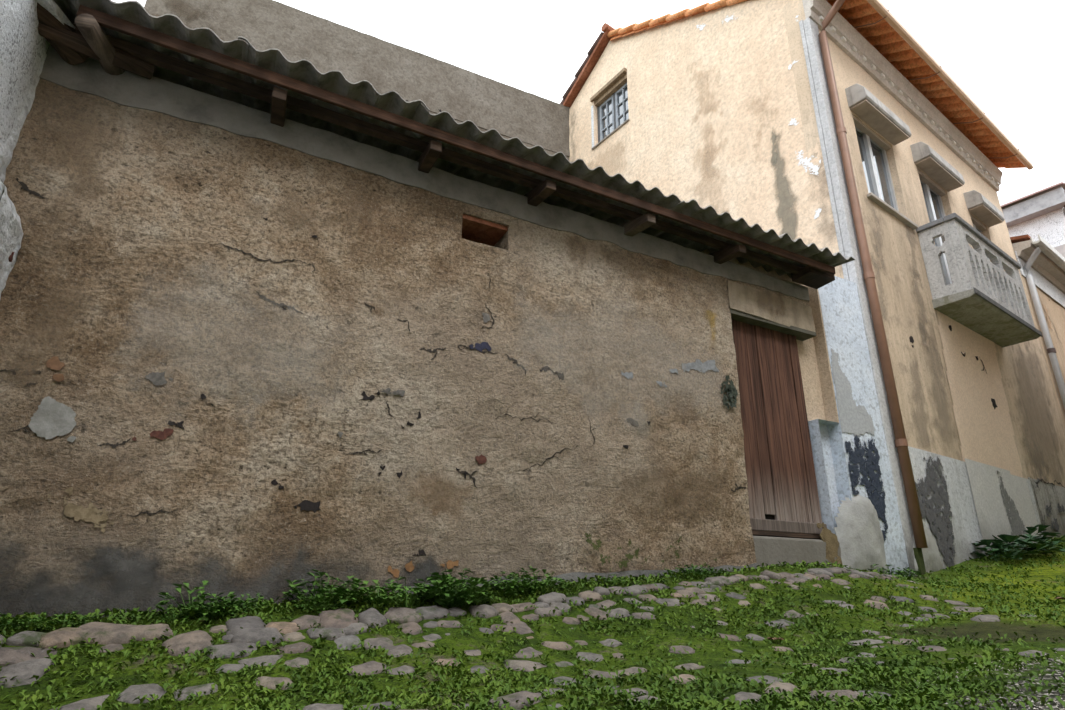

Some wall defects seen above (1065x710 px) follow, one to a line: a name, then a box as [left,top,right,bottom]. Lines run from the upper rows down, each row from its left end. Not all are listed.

peeling [795,150,821,175]
damp [771,132,797,240]
crack [216,243,316,272]
crack [364,273,559,375]
spalling [469,342,491,352]
crack [495,414,557,424]
crack [523,417,596,471]
peeling [831,348,888,541]
crack [127,509,180,517]
spalling [293,500,321,512]
peeling [915,456,956,567]